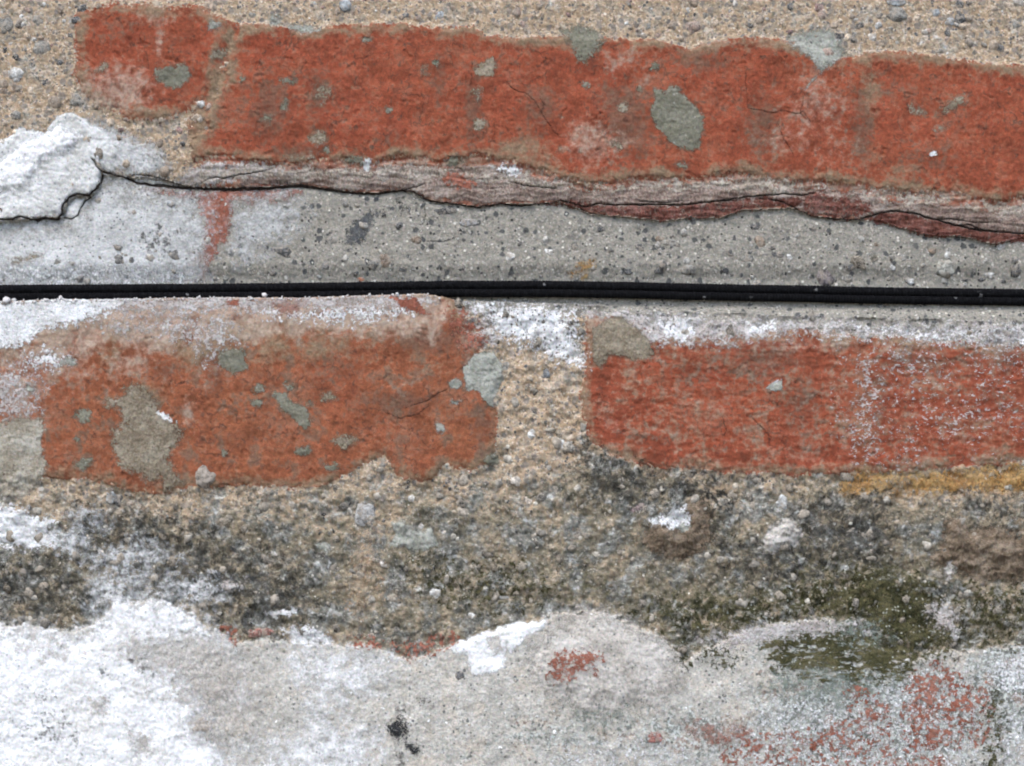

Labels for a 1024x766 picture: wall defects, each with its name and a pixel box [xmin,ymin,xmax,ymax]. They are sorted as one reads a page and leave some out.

crack [0,158,1024,242]
peeling [694,617,881,650]
peeling [925,598,962,640]